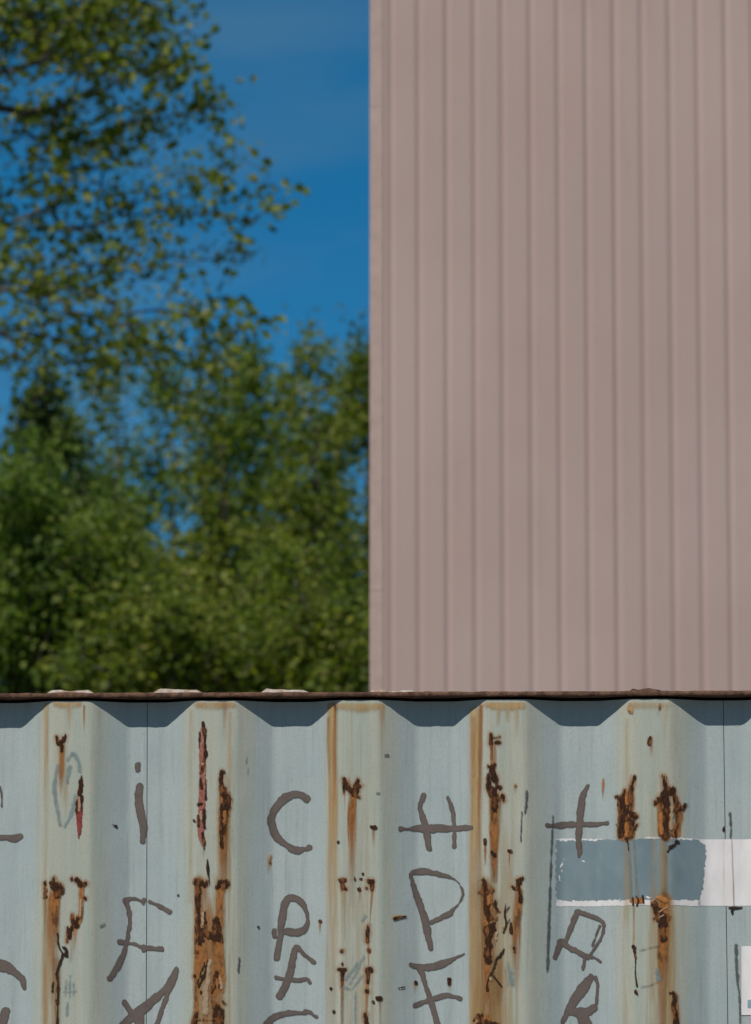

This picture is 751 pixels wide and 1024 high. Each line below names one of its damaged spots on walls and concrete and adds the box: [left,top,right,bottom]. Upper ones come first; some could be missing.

corrosion [43,877,87,1024]
corrosion [191,770,231,1024]
corrosion [329,949,347,1022]
corrosion [328,702,383,866]
corrosion [338,873,383,1024]
corrosion [470,702,525,1024]
corrosion [602,775,639,902]
corrosion [650,774,688,1024]